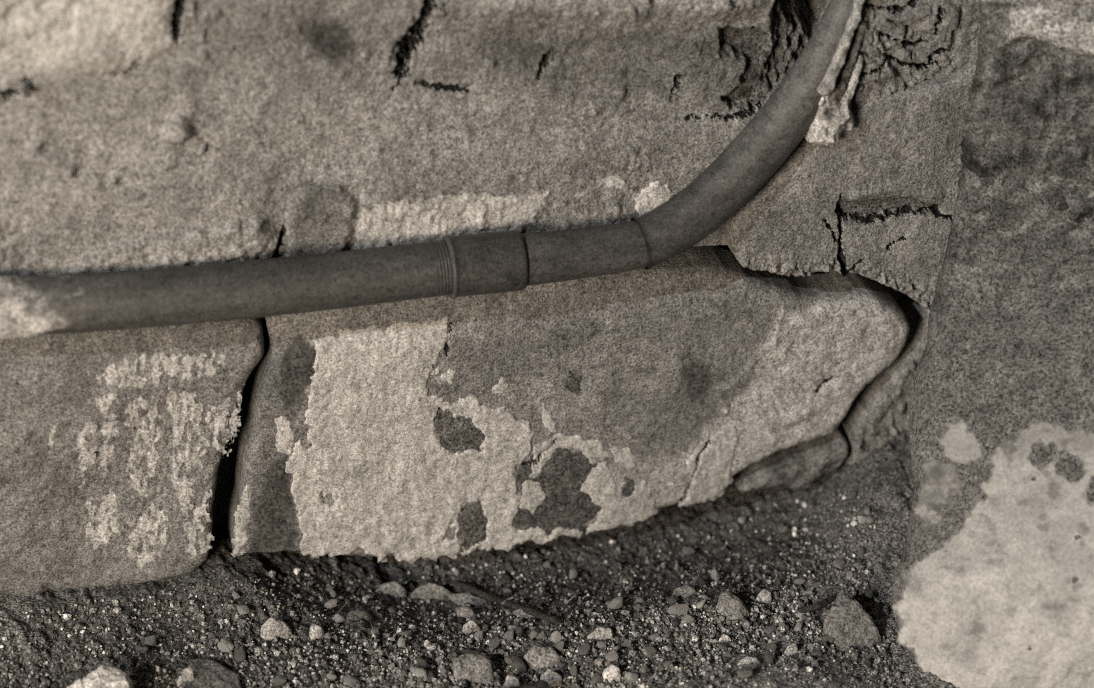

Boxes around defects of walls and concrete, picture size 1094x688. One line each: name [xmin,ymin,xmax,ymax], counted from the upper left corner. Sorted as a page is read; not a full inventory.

crack [391,0,470,100]
crack [860,0,953,84]
crack [823,193,953,277]
peeling [275,317,659,564]
peeling [678,422,743,508]
peeling [231,481,252,557]